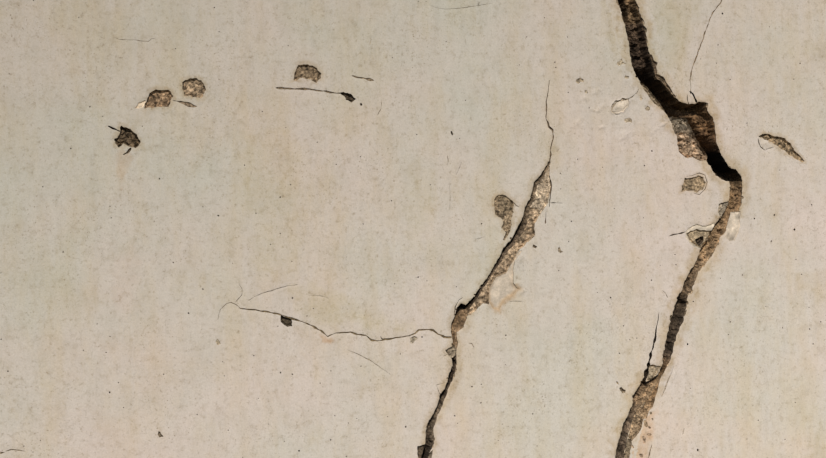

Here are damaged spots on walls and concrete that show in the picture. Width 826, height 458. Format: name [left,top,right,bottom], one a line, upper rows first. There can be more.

spalling [135,71,211,114]
spalling [288,58,328,86]
crack [276,75,374,102]
spalling [108,120,150,155]
spalling [754,129,809,164]
spalling [675,171,711,198]
spalling [488,188,519,246]
crack [603,0,755,458]
crack [218,86,555,458]